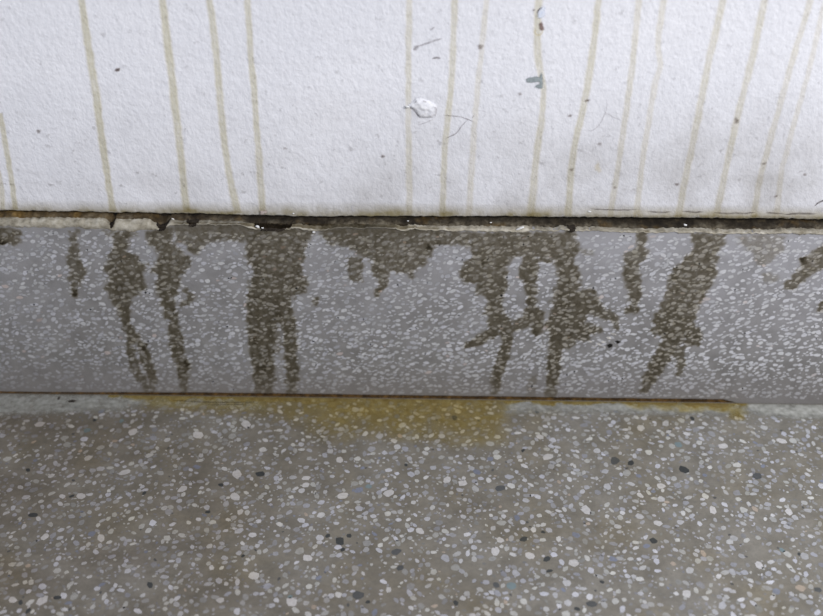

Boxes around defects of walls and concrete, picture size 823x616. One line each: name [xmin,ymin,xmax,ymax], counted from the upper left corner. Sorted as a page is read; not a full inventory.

damp [523,233,596,342]
damp [248,295,292,374]
efflorescence [0,394,137,412]
damp [507,401,823,418]